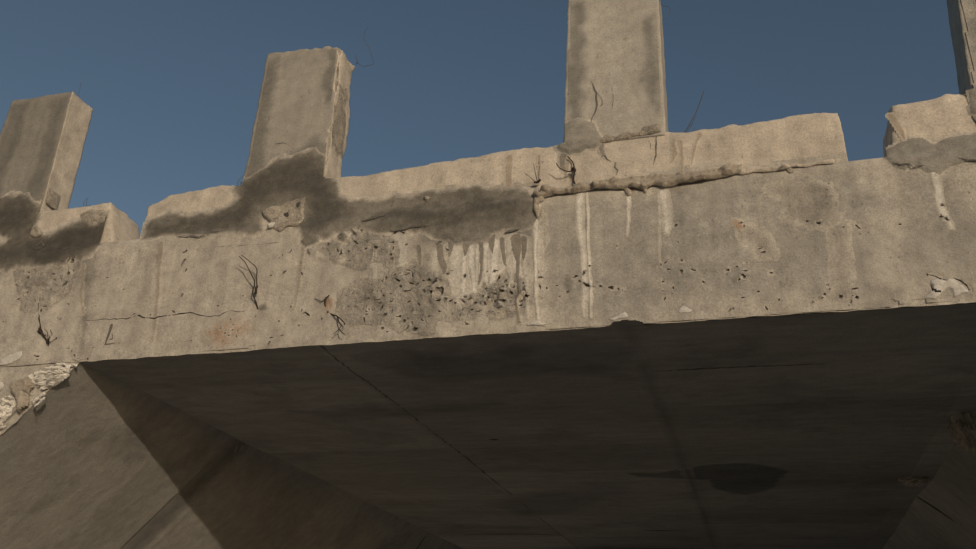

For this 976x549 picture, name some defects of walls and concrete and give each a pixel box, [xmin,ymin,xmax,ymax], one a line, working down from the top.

damp [885,112,907,141]
spalling [262,197,306,232]
crack [36,276,244,361]
damp [272,128,976,428]
peeling [926,278,969,303]
damp [467,461,795,520]